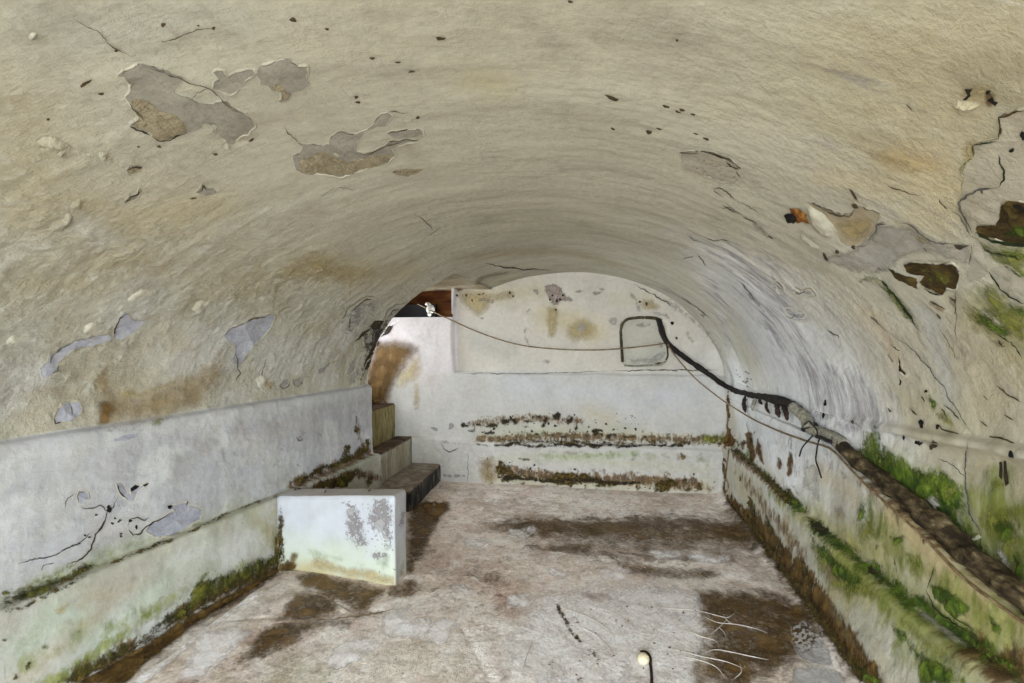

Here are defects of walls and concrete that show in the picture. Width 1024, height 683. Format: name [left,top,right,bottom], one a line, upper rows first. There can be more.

peeling [115,57,311,156]
peeling [291,111,426,180]
peeling [807,89,1024,320]
peeling [38,310,149,380]
peeling [221,311,277,380]
leakage [483,461,702,493]
leakage [461,412,764,472]
leakage [774,452,793,481]
leakage [999,460,1009,486]
crack [21,512,108,570]
peeling [343,498,405,560]
leakage [133,501,456,683]